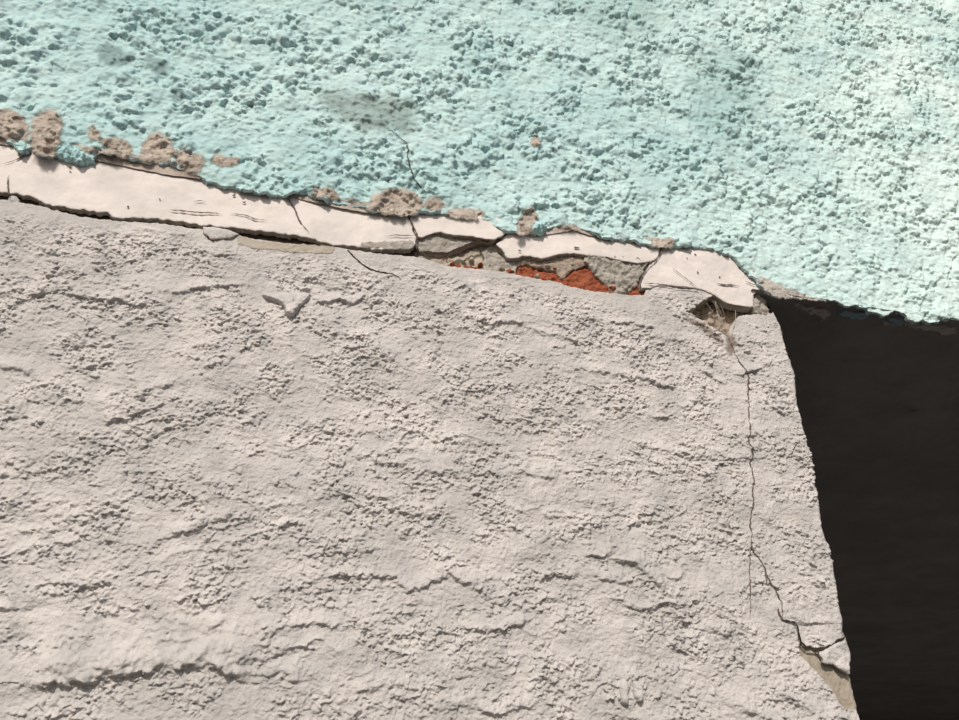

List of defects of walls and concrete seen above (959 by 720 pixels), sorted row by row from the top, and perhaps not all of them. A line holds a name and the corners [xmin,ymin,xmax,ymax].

peeling [0,108,240,174]
crack [0,153,114,221]
crack [143,198,423,279]
spalling [311,187,675,295]
crack [729,339,786,622]
peeling [783,620,857,711]